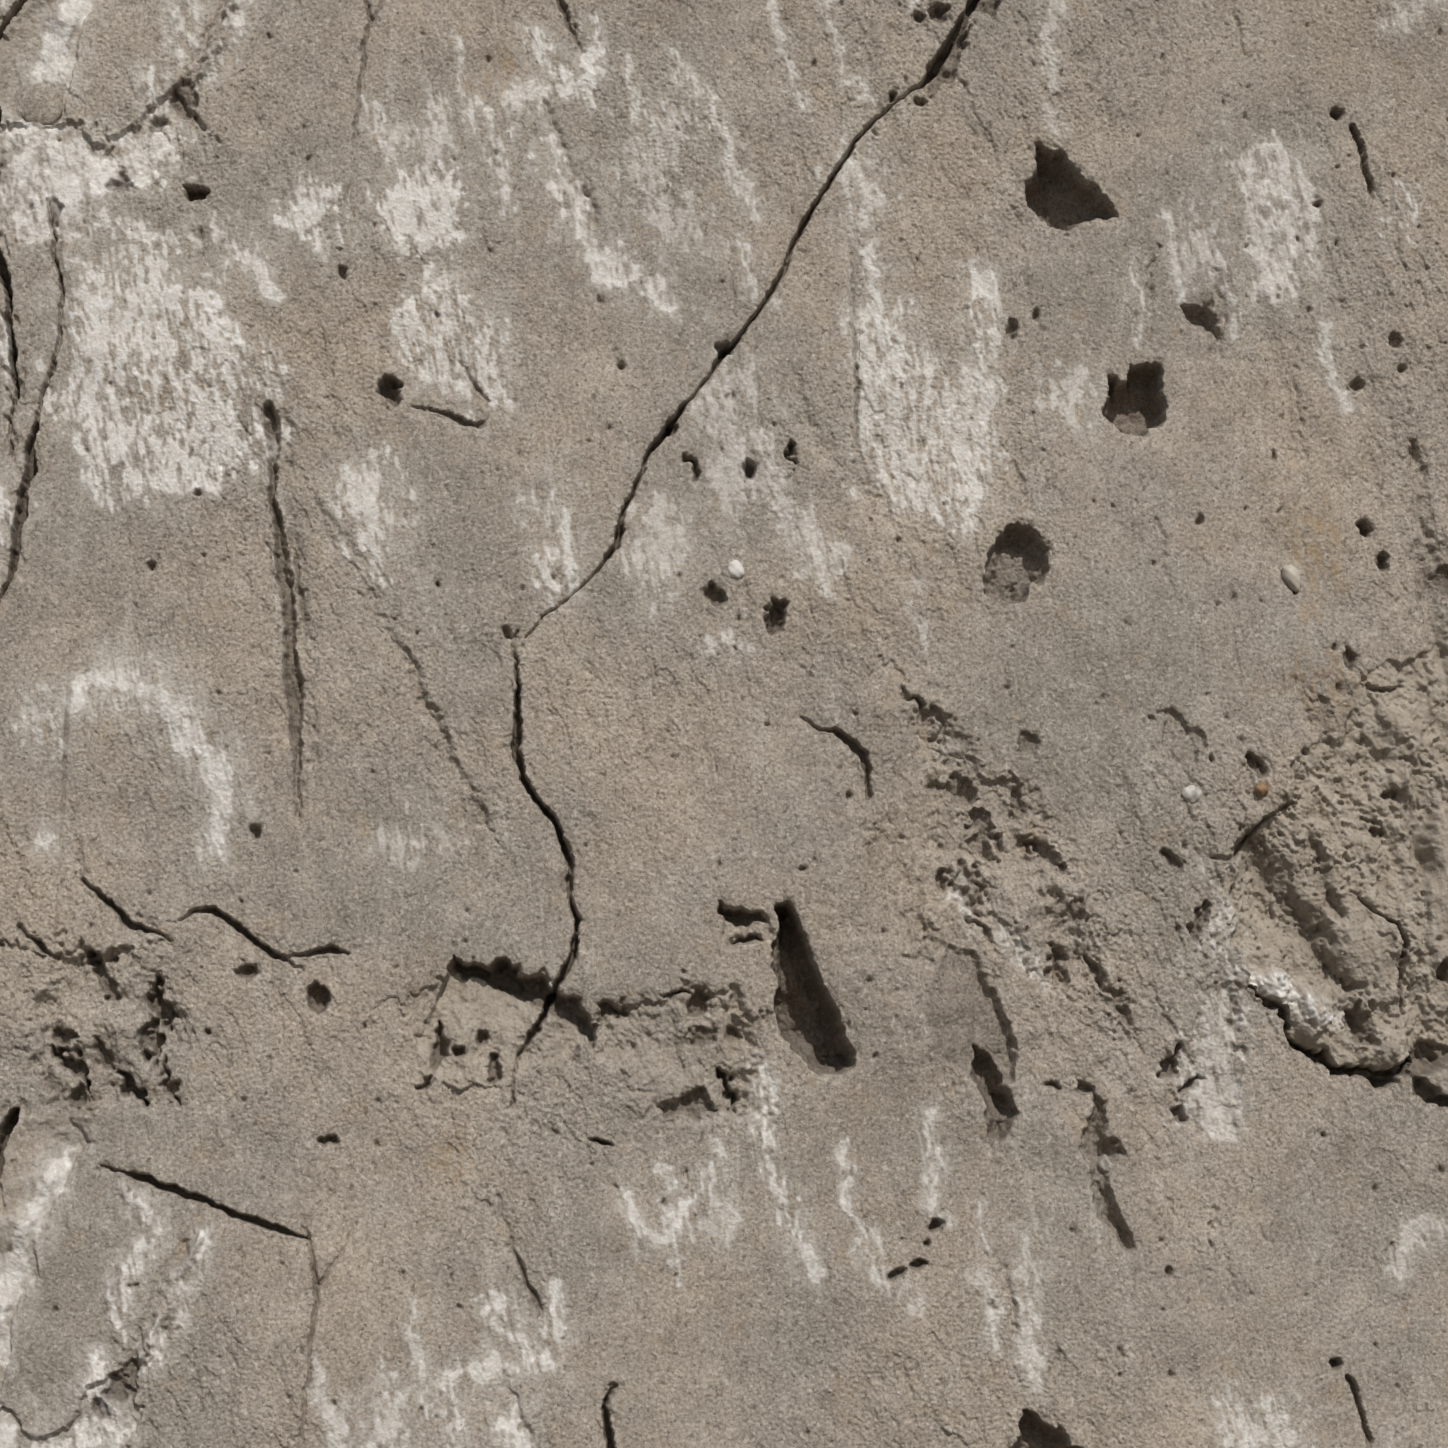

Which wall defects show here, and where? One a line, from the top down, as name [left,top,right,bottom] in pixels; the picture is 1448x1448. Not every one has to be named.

crack [0,0,30,42]
crack [0,196,67,606]
crack [509,0,1002,1111]
crack [0,923,64,962]
crack [79,876,353,973]
crack [0,1107,21,1185]
crack [601,1383,620,1448]